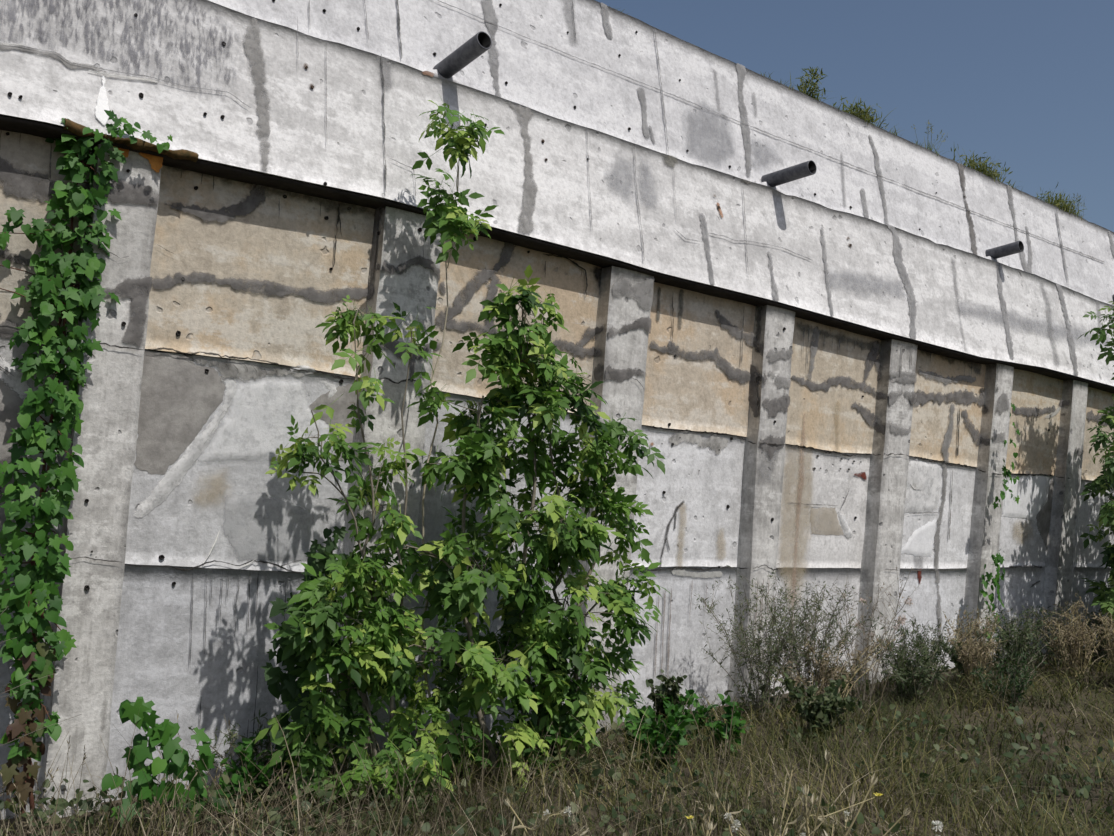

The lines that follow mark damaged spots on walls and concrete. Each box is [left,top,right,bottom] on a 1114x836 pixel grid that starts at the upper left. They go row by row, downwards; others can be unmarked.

damp [0,0,235,93]
corrosion [113,146,163,173]
crack [75,0,1114,655]
peeling [0,356,30,401]
damp [190,569,259,662]